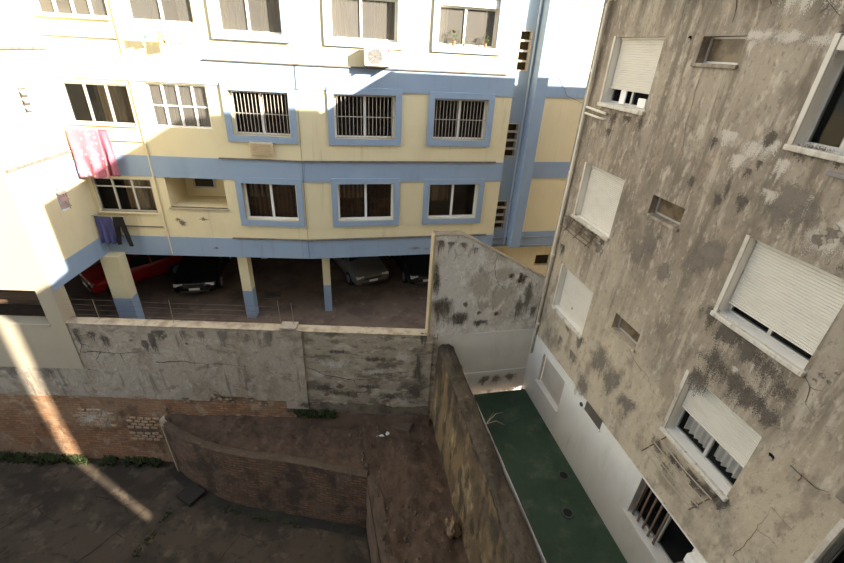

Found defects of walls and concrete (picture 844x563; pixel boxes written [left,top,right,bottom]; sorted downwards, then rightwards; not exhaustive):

damp [738,0,844,61]
damp [709,128,844,270]
damp [411,240,536,328]
damp [72,328,110,348]
damp [141,330,164,353]
damp [288,331,433,414]
damp [476,373,516,386]
damp [558,326,640,420]
damp [685,302,799,435]
spalling [71,407,164,442]